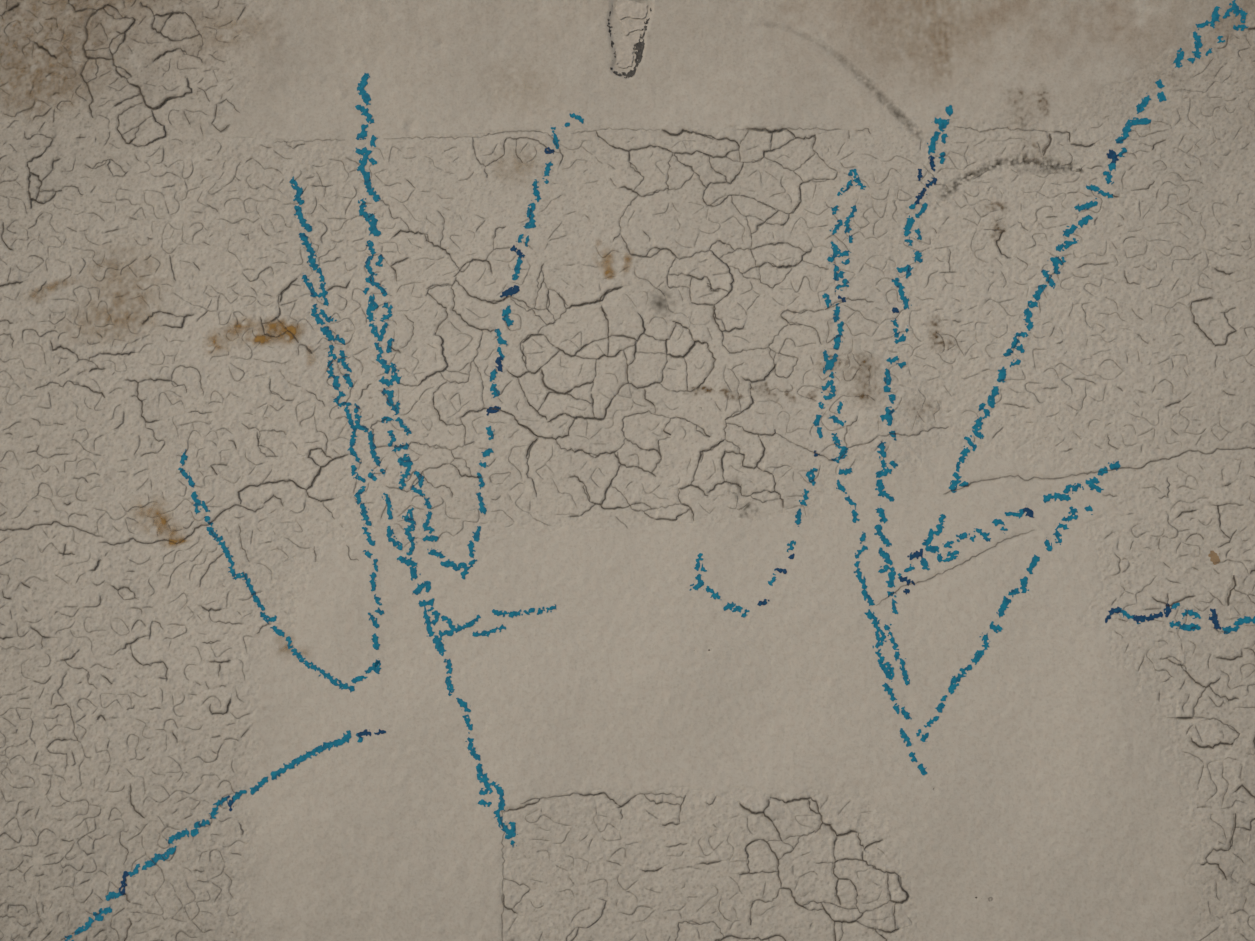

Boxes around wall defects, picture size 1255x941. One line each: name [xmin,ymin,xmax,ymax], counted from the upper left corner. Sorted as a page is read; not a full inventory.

crack [0,126,384,941]
corrosion [254,322,297,344]
crack [865,5,1255,941]